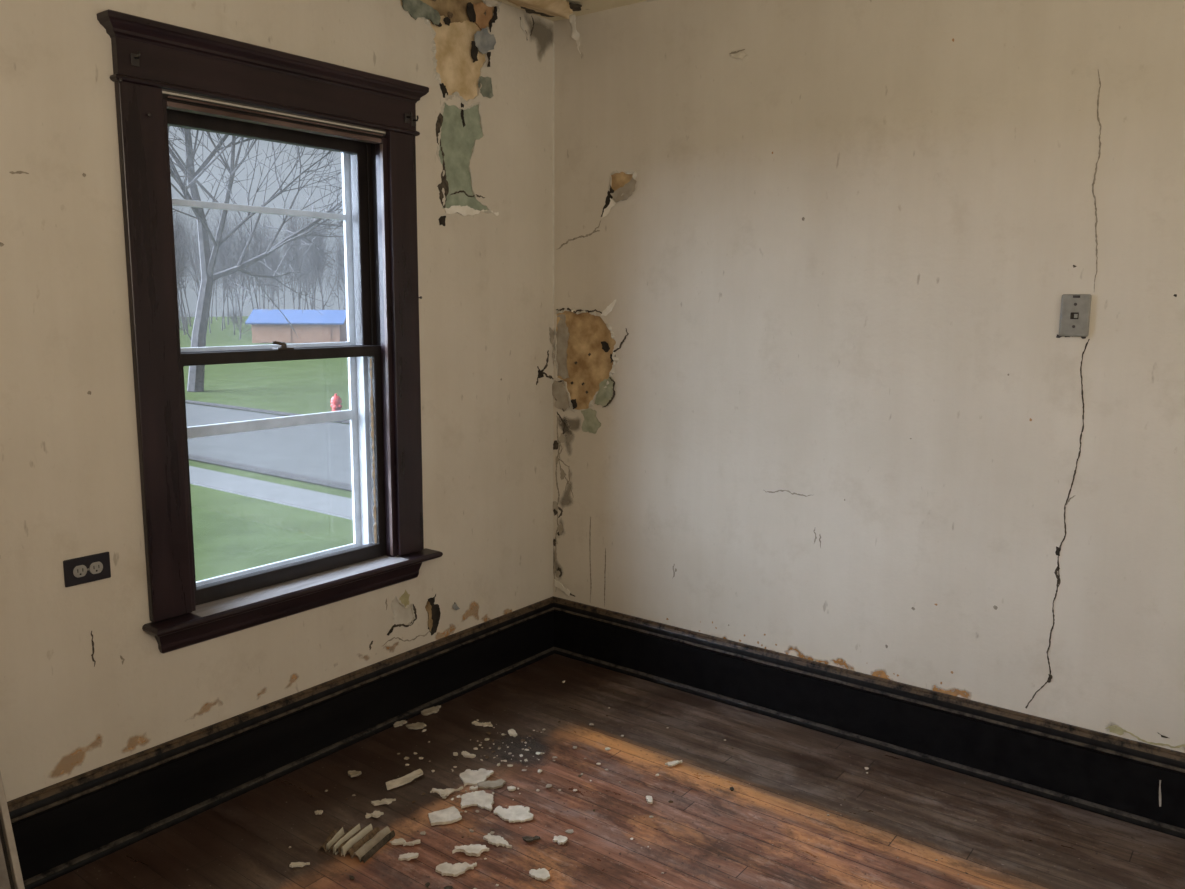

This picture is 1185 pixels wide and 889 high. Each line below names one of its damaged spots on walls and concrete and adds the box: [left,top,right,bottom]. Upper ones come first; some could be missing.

spalling [400,0,502,226]
peeling [601,170,637,219]
crack [1092,71,1102,290]
spalling [549,299,629,434]
peeling [383,589,460,646]
crack [1025,339,1090,709]